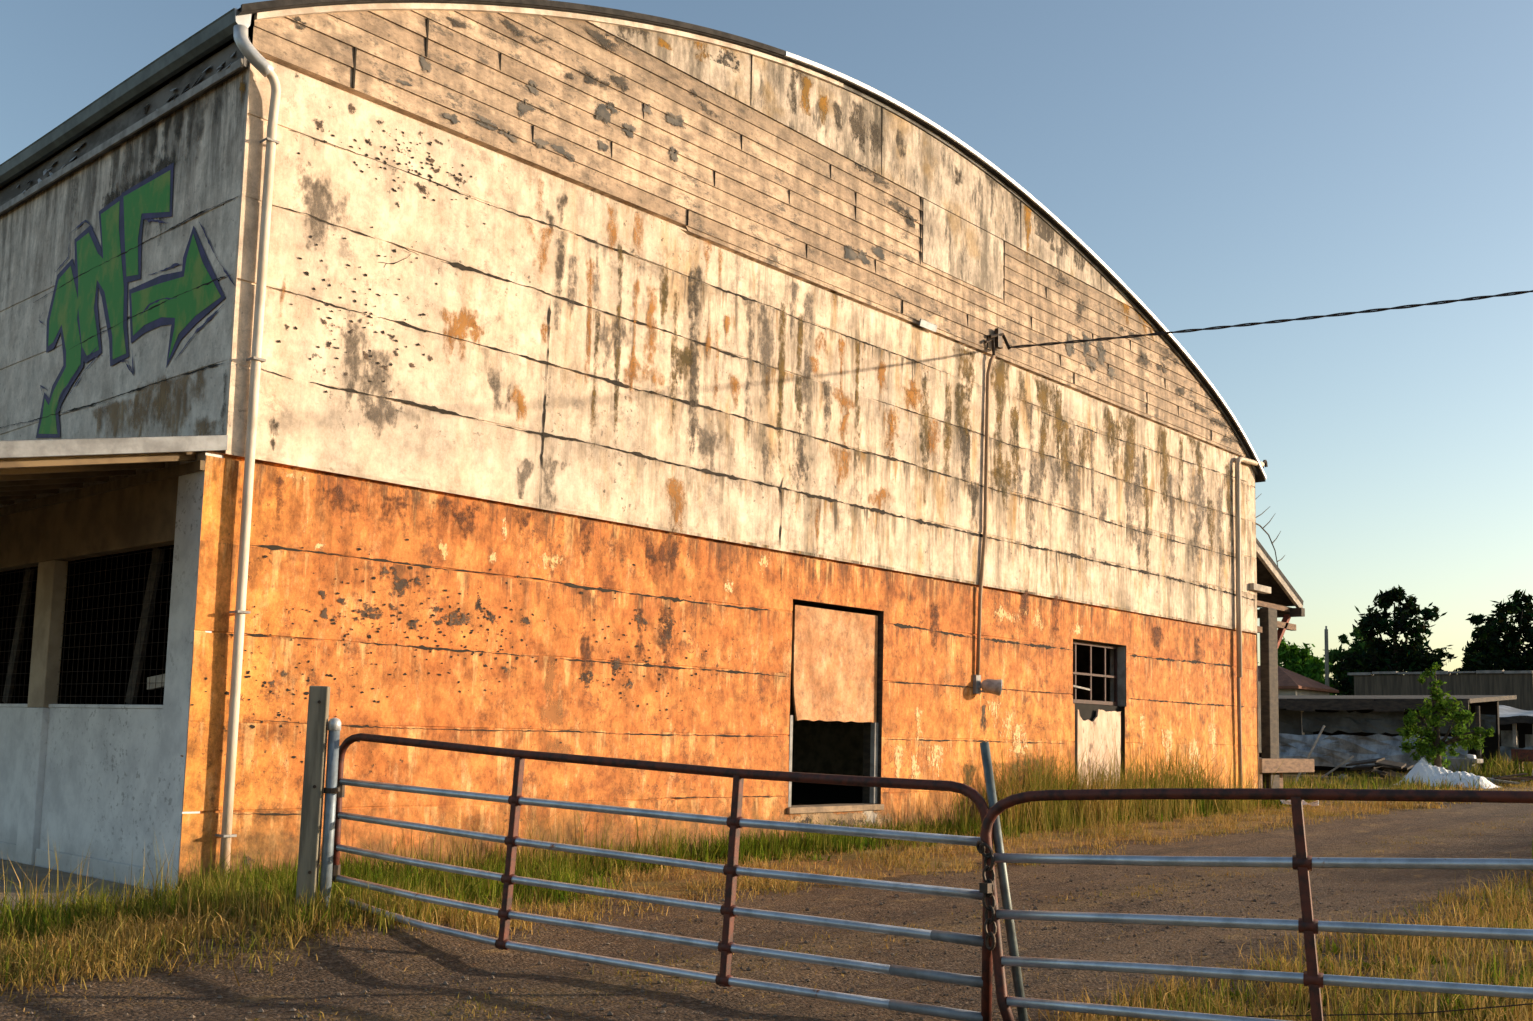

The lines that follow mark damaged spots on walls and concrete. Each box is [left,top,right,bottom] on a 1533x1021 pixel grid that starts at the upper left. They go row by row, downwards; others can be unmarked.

water stain [302,176,346,247]
water stain [342,324,398,436]
corrosion [443,308,484,359]
water stain [488,375,510,408]
water stain [547,194,631,446]
water stain [660,264,723,470]
water stain [745,282,832,481]
water stain [518,458,565,533]
corrosion [666,479,686,524]
corrosion [869,489,886,509]
water stain [920,375,979,525]
water stain [991,359,1234,583]